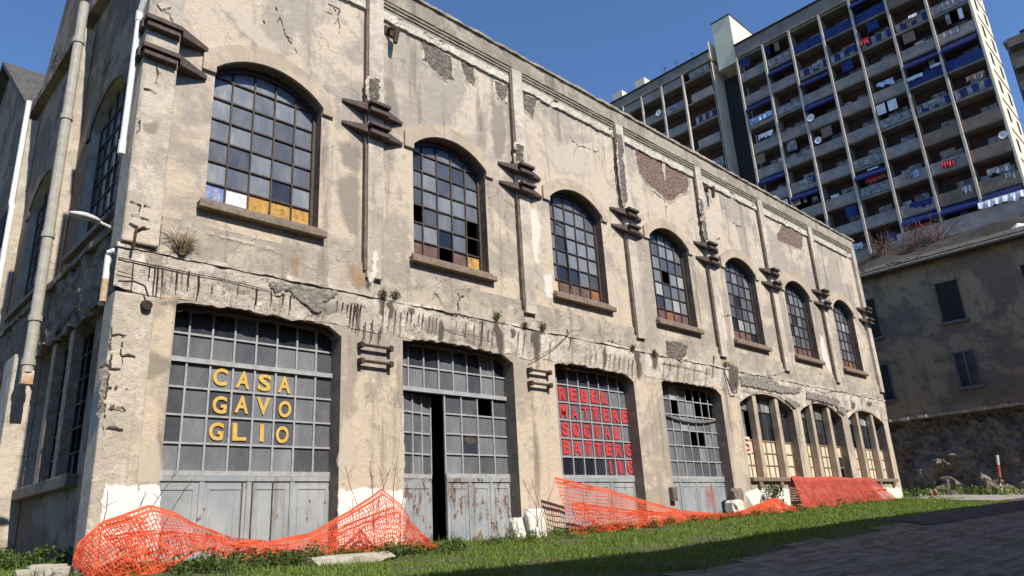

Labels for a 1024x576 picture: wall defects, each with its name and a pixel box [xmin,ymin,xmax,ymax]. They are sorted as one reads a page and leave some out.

crack [263,7,297,53]
spalling [420,41,478,87]
spalling [523,93,540,121]
spalling [616,134,709,241]
spalling [117,257,494,346]
leakage [409,307,444,339]
spalling [96,326,136,434]
spalling [739,375,842,409]